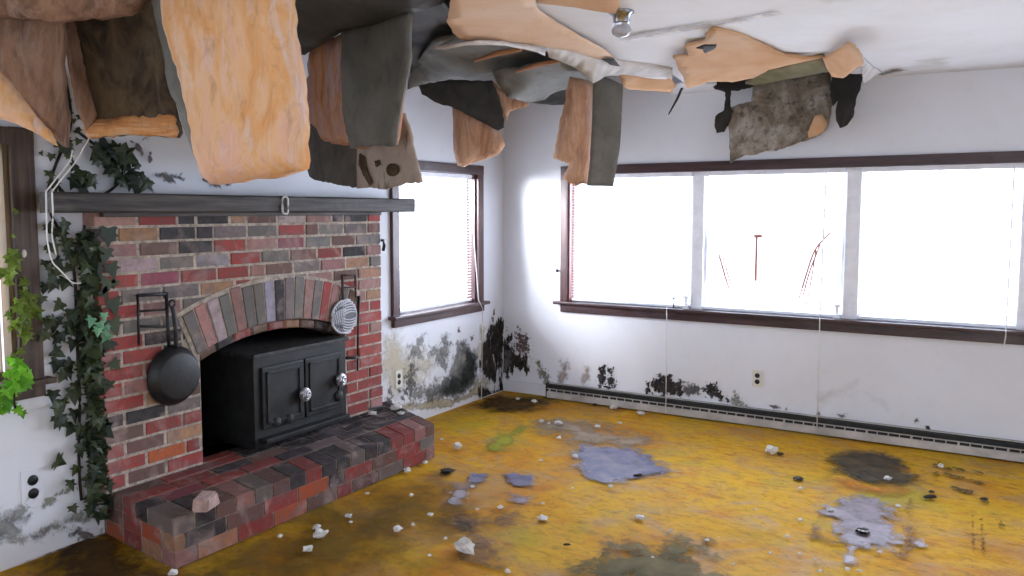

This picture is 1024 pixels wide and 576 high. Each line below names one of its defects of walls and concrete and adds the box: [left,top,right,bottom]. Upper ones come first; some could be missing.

damp [384,308,652,448]
mould [645,373,747,407]
damp [826,450,917,486]